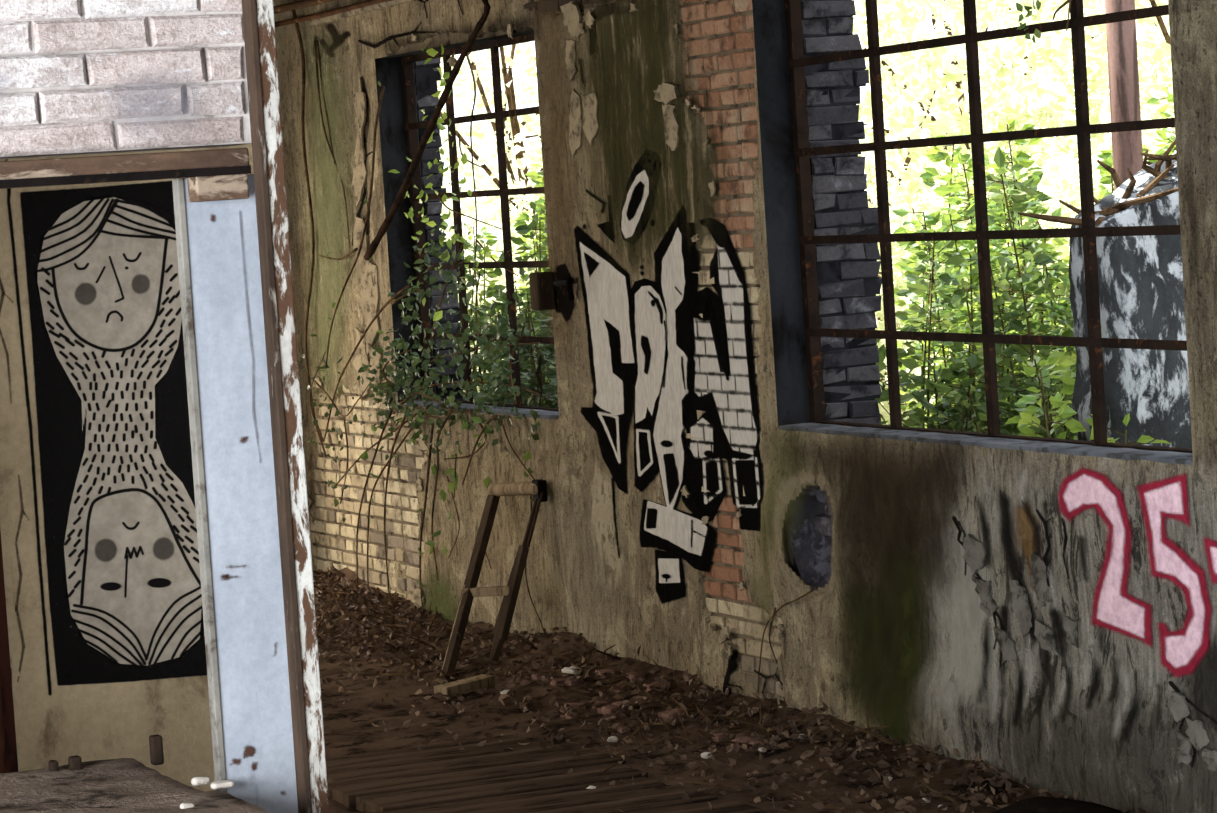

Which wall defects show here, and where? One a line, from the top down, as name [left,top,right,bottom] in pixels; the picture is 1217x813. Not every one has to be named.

flaking render [523,0,639,156]
crack [0,278,13,402]
rust [242,0,312,813]
flaking render [307,91,429,608]
flaking render [653,0,767,493]
flaking render [701,459,785,708]
water stain [790,440,1008,746]
crack [952,516,982,579]
water stain [979,489,1052,725]
crack [1036,509,1069,586]
water stain [1050,609,1138,740]
crack [1169,681,1217,767]